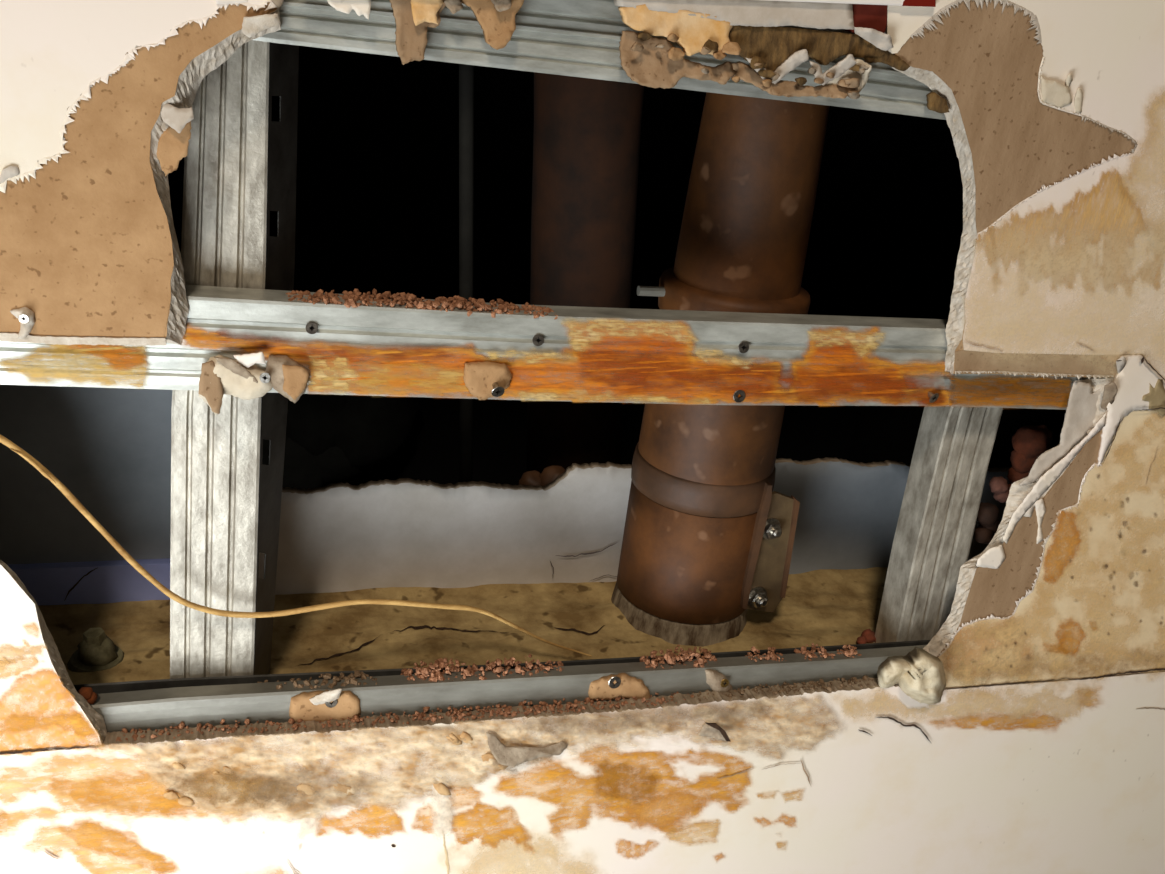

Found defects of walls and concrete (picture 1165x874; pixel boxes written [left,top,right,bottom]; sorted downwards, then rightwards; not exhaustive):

water stain [968,92,1165,362]
corrosion [0,344,147,387]
peeling [233,352,266,368]
corrosion [185,319,1071,408]
water stain [843,414,1165,730]
water stain [0,642,292,874]
crack [858,716,931,743]
water stain [316,804,434,837]
water stain [447,745,800,874]